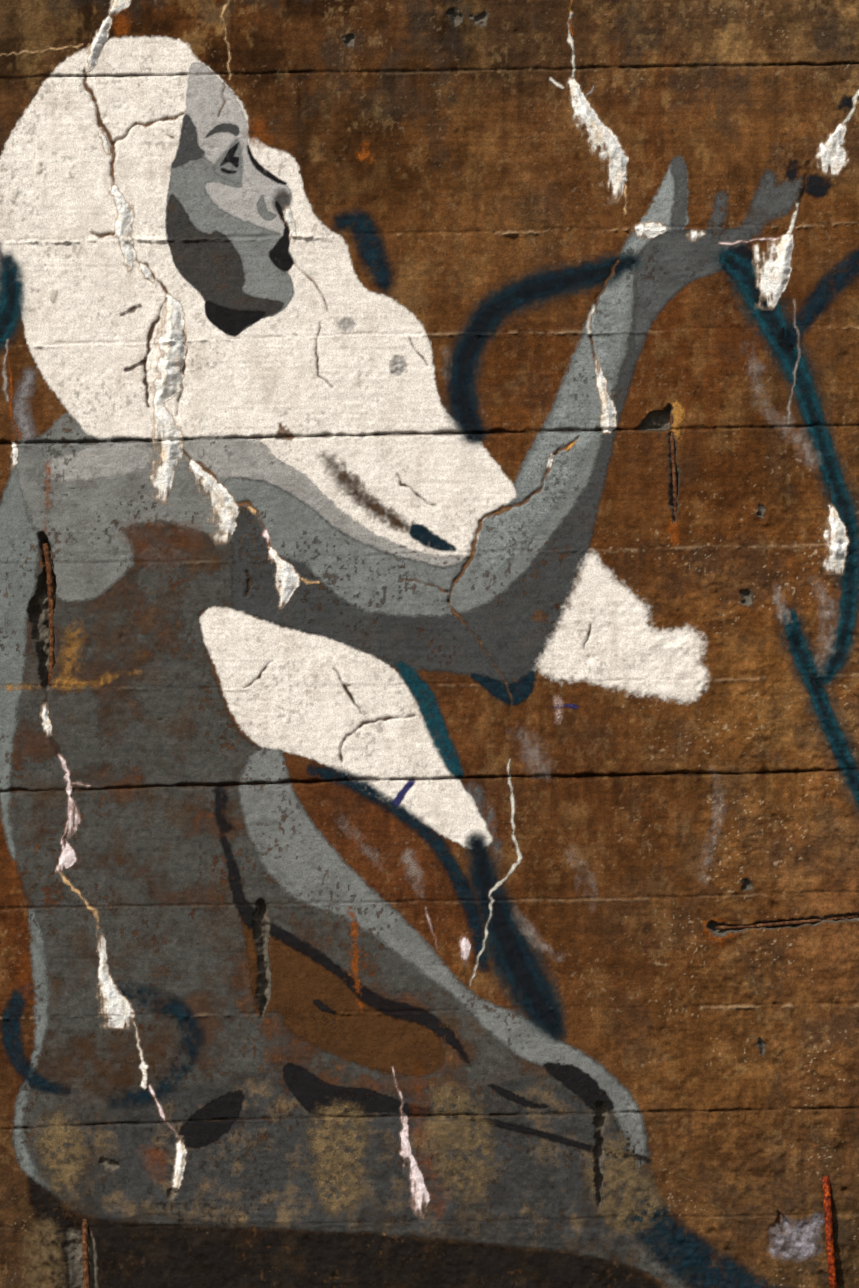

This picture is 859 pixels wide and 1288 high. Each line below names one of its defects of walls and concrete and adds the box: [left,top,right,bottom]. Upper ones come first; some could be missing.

crack [12,44,183,185]
crack [109,0,131,14]
crack [218,4,231,117]
crack [567,1,575,77]
crack [842,90,859,124]
crack [404,441,576,714]
crack [40,698,98,921]
crack [473,760,522,977]
crack [392,1067,430,1213]